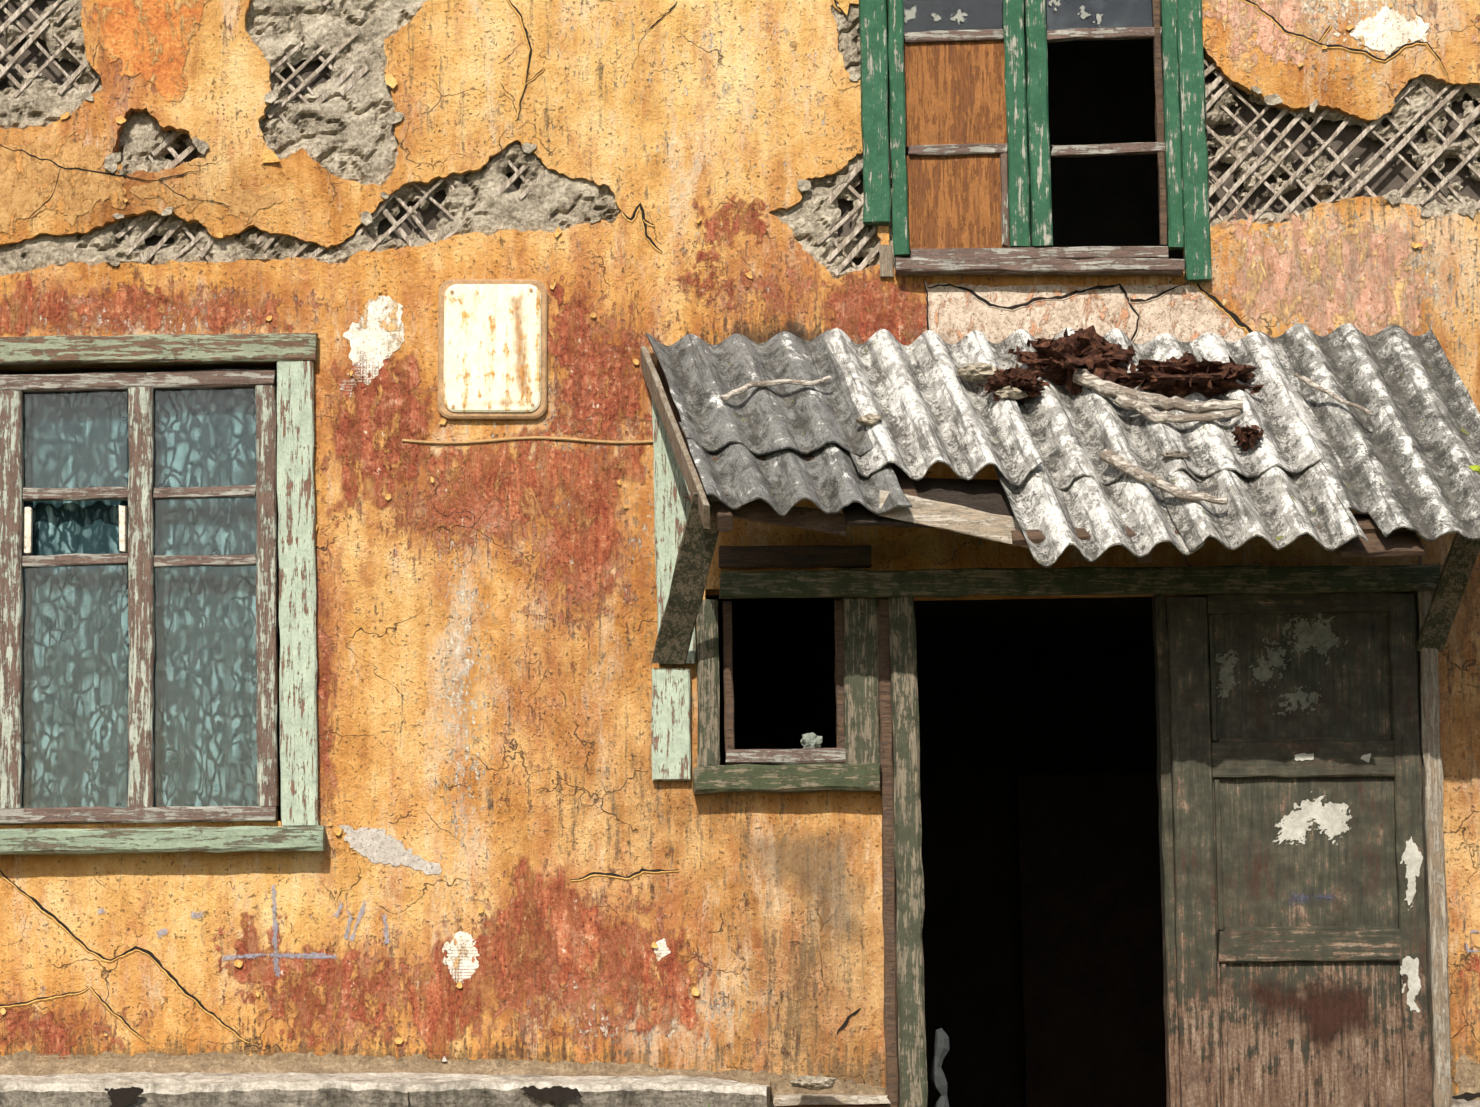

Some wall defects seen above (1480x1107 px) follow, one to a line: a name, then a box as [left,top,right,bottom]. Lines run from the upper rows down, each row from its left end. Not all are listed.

crack [506,0,546,120]
flaking render [0,0,621,337]
flaking render [675,0,1480,345]
crack [924,282,1253,342]
peeling [315,275,653,593]
peeling [316,653,442,875]
crack [0,870,250,1044]
peeling [0,856,702,1071]
spalling [104,1086,144,1107]
spalling [689,1069,886,1107]